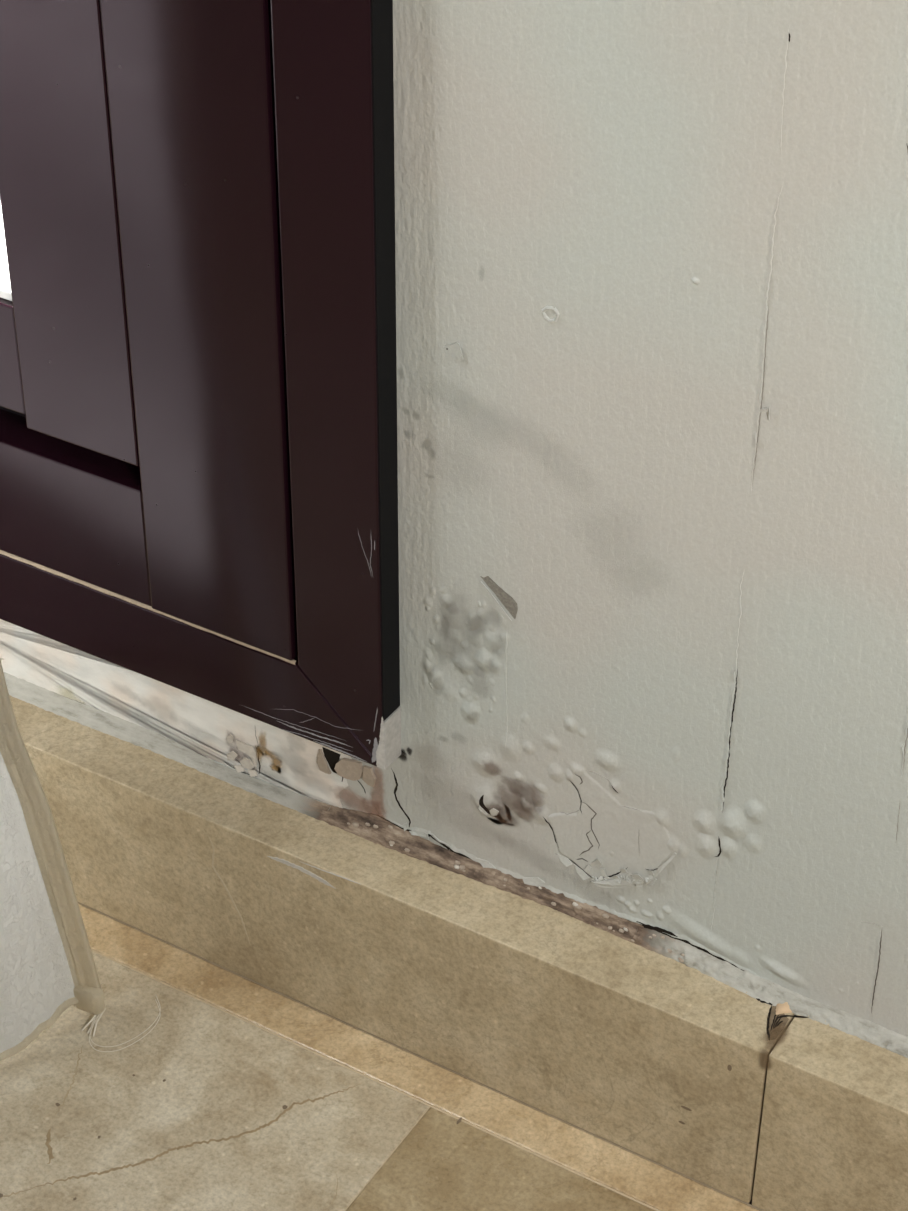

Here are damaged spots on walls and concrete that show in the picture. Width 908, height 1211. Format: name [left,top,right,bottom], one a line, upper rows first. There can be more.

crack [750,188,782,490]
flaking render [223,730,261,777]
flaking render [316,747,376,793]
peeling [479,576,518,751]
crack [715,569,745,857]
crack [898,704,908,777]
crack [376,768,779,985]